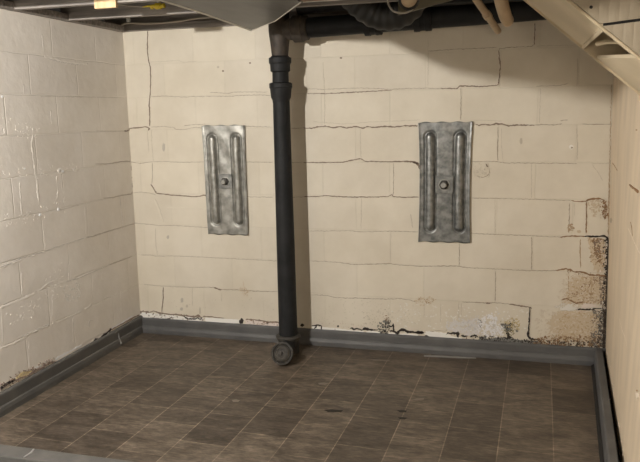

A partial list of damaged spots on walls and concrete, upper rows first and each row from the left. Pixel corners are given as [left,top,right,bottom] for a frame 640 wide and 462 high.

crack [100,31,271,198]
crack [292,24,617,340]
leakage [309,237,609,348]